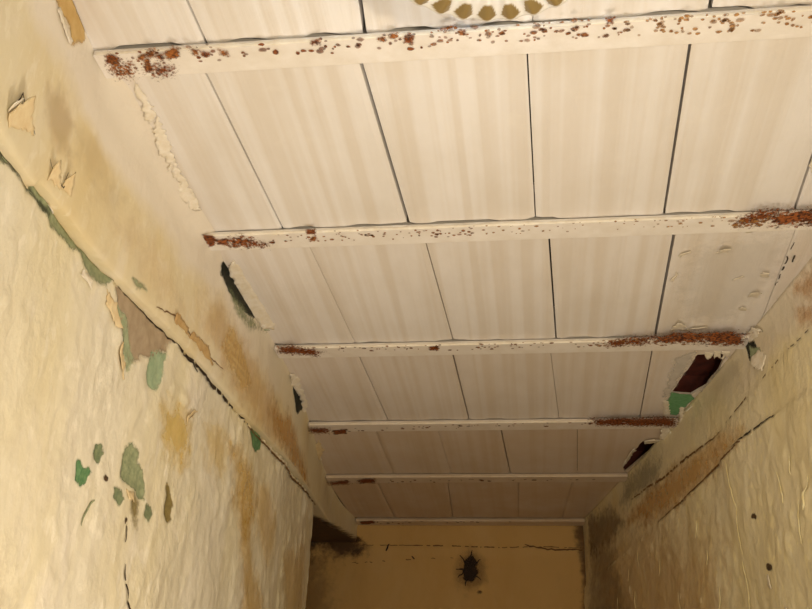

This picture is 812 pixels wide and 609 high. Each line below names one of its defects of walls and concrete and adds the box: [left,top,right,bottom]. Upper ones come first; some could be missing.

rust [377,26,508,51]
rust [105,44,229,80]
rust [719,207,812,229]
rust [203,229,350,250]
flaking render [0,152,171,390]
peeling [221,260,275,331]
rust [570,329,750,349]
flaking render [623,351,731,470]
peeling [75,444,104,486]
peeling [113,443,152,524]
mould [310,516,364,556]
leakage [456,551,481,586]